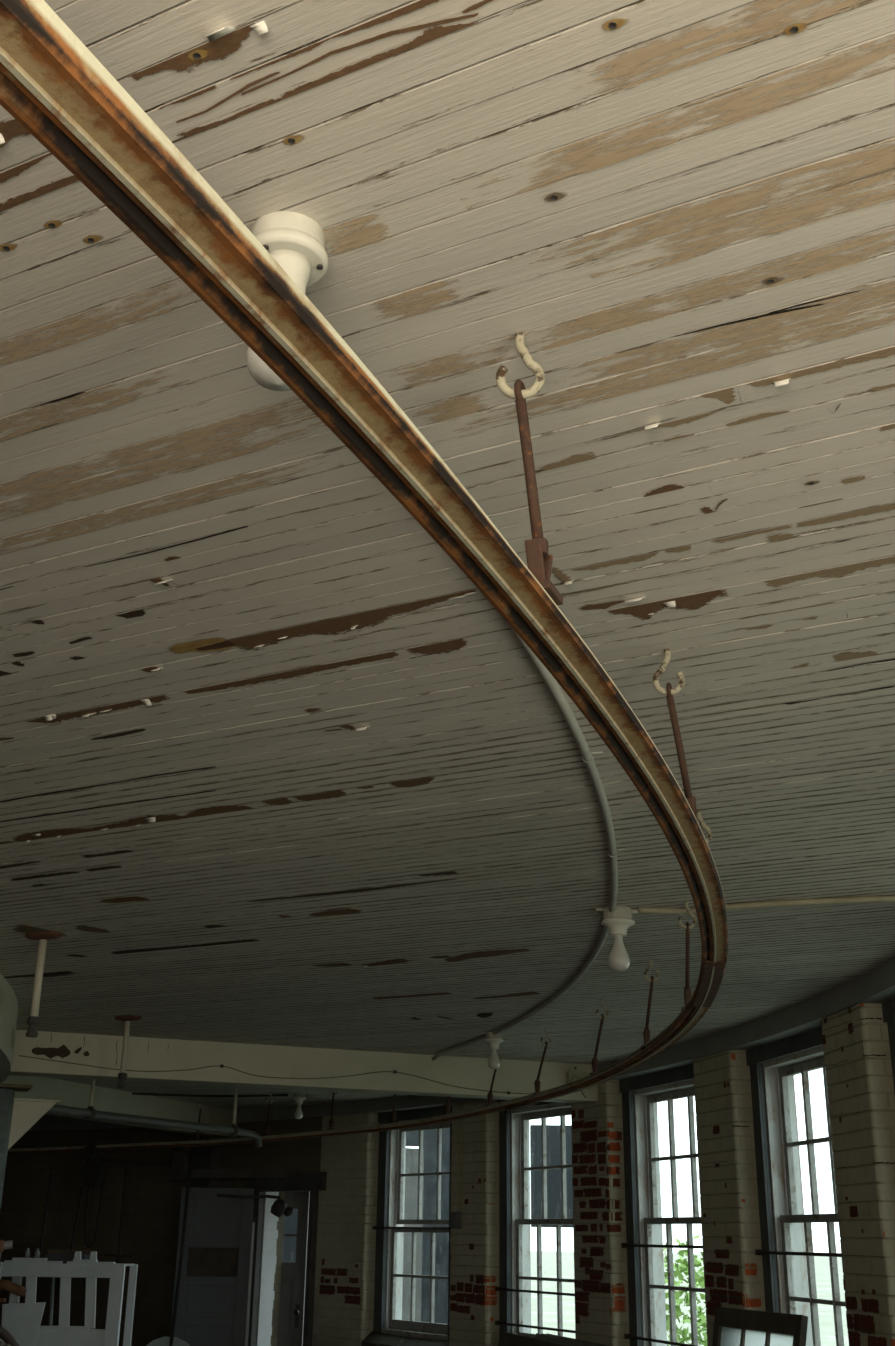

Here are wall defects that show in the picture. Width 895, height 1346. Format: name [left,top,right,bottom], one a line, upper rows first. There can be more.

peeling [128,20,269,81]
peeling [159,0,493,140]
peeling [518,35,895,194]
peeling [538,138,895,278]
peeling [395,227,895,445]
peeling [228,590,478,651]
peeling [581,589,728,622]
peeling [765,557,895,587]
peeling [0,786,374,844]
peeling [571,1109,626,1324]
peeling [703,1213,761,1316]
peeling [843,1280,895,1346]